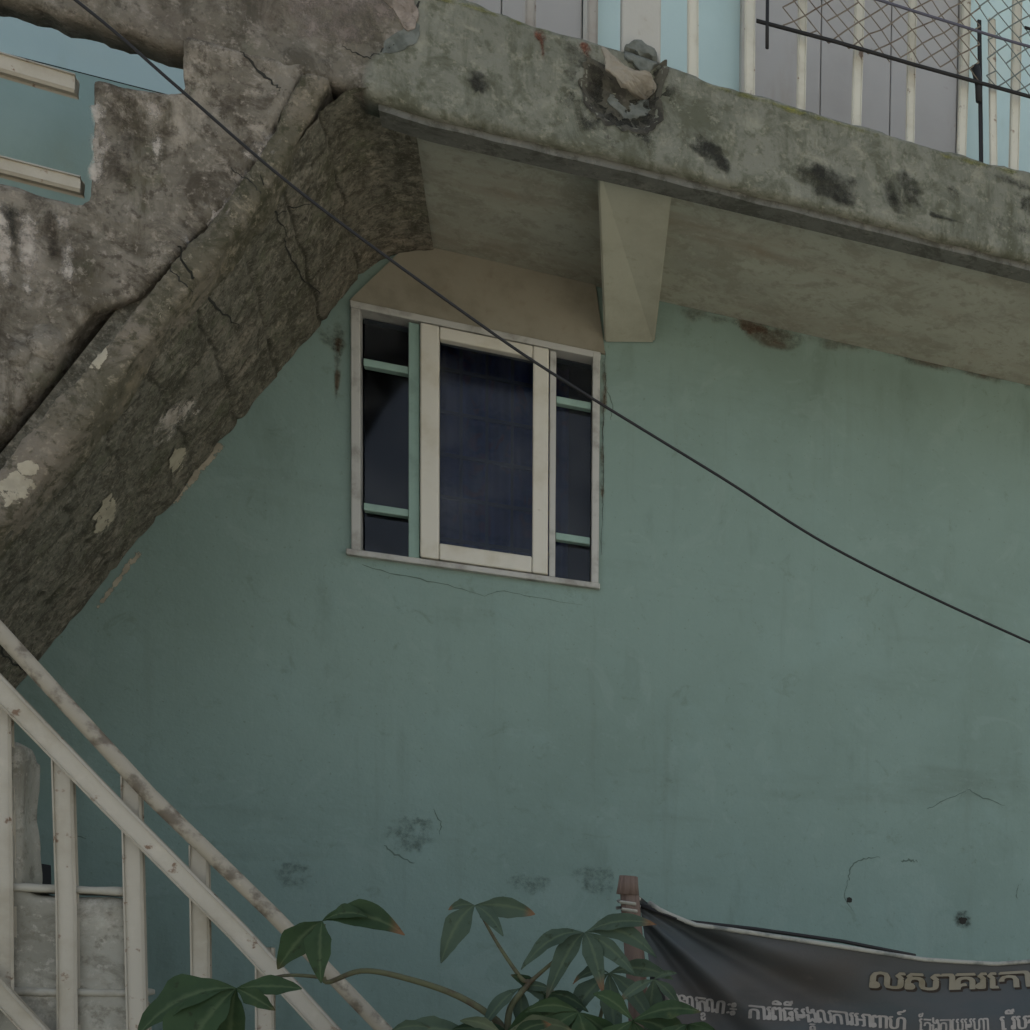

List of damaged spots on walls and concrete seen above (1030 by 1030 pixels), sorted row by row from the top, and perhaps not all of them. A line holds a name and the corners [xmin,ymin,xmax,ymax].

spalling [292,0,420,54]
spalling [572,39,674,136]
leakage [694,141,729,172]
leakage [800,164,855,206]
leakage [887,173,918,210]
crack [170,246,239,325]
flaking render [0,460,48,507]
flaking render [92,493,117,534]
crack [362,564,580,605]
crack [1,646,26,673]